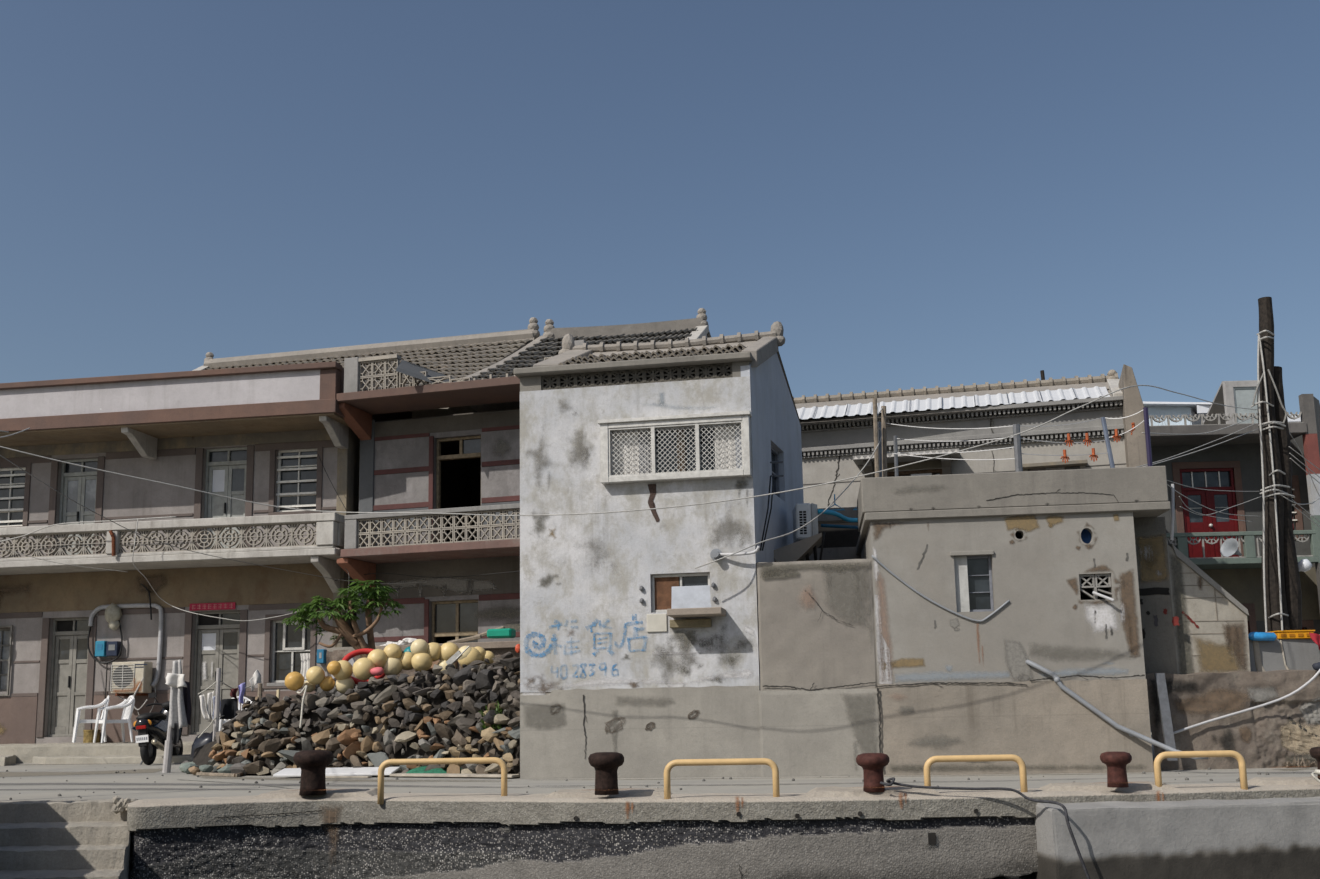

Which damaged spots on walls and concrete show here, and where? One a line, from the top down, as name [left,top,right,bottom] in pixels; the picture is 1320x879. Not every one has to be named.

crack [828,456,840,506]
leakage [648,484,660,522]
leakage [716,521,747,541]
spalling [1176,687,1277,713]
spalling [1281,697,1320,754]